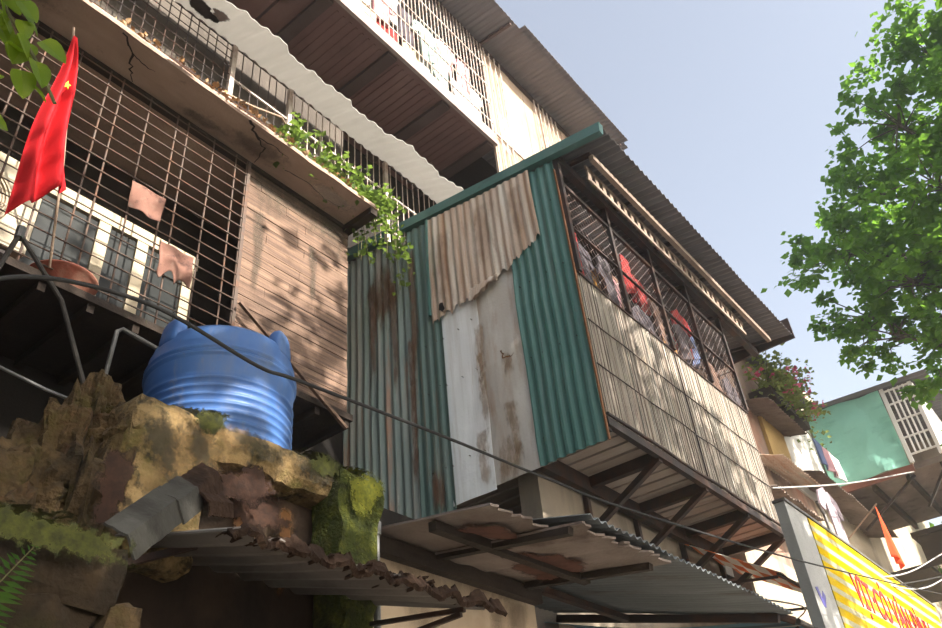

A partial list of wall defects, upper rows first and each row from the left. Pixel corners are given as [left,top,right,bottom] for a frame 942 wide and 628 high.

crack [122,32,155,82]
crack [249,120,347,211]
rust [369,254,418,474]
rust [457,524,587,581]